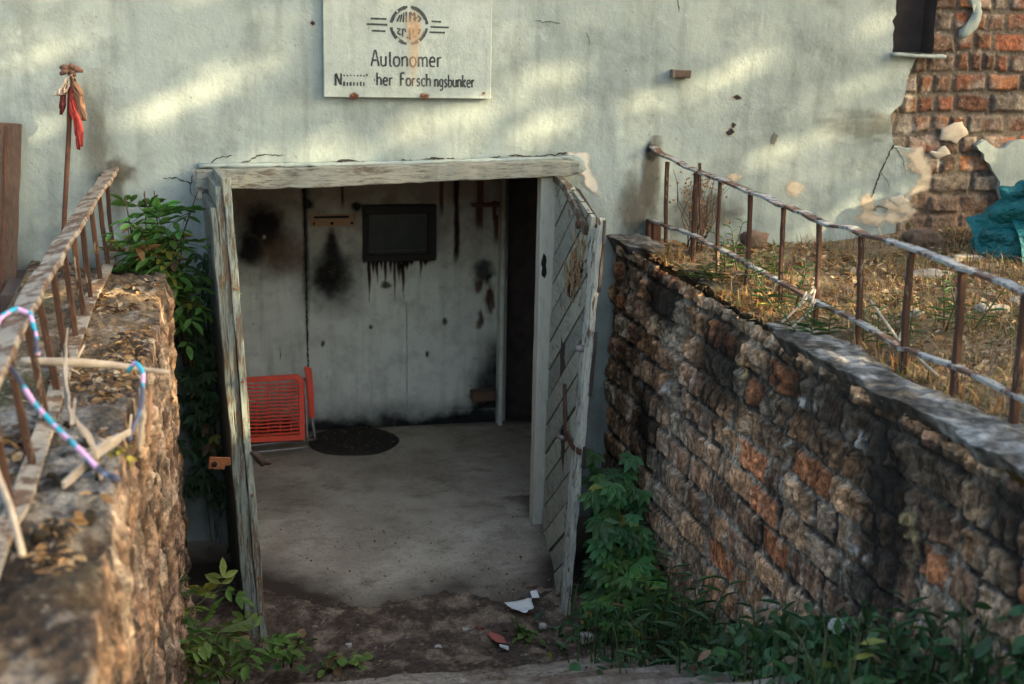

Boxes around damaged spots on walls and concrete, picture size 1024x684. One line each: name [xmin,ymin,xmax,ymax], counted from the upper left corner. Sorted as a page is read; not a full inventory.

flaking render [856,0,1024,231]
rust [476,180,499,240]
flaking render [568,152,600,196]
flaking render [787,182,803,196]
crack [871,145,918,212]